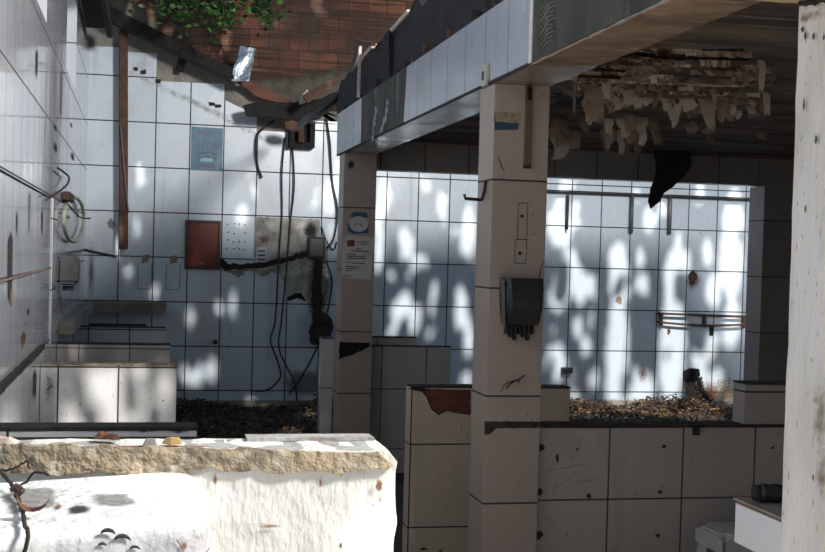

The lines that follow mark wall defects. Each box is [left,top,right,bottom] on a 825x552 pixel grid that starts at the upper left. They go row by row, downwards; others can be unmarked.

crack [798,0,825,8]
peeling [548,48,778,160]
spalling [253,217,334,345]
spalling [338,342,374,359]
spalling [408,385,471,415]
spalling [0,438,394,476]
spalling [3,488,58,513]
spalling [96,494,135,505]